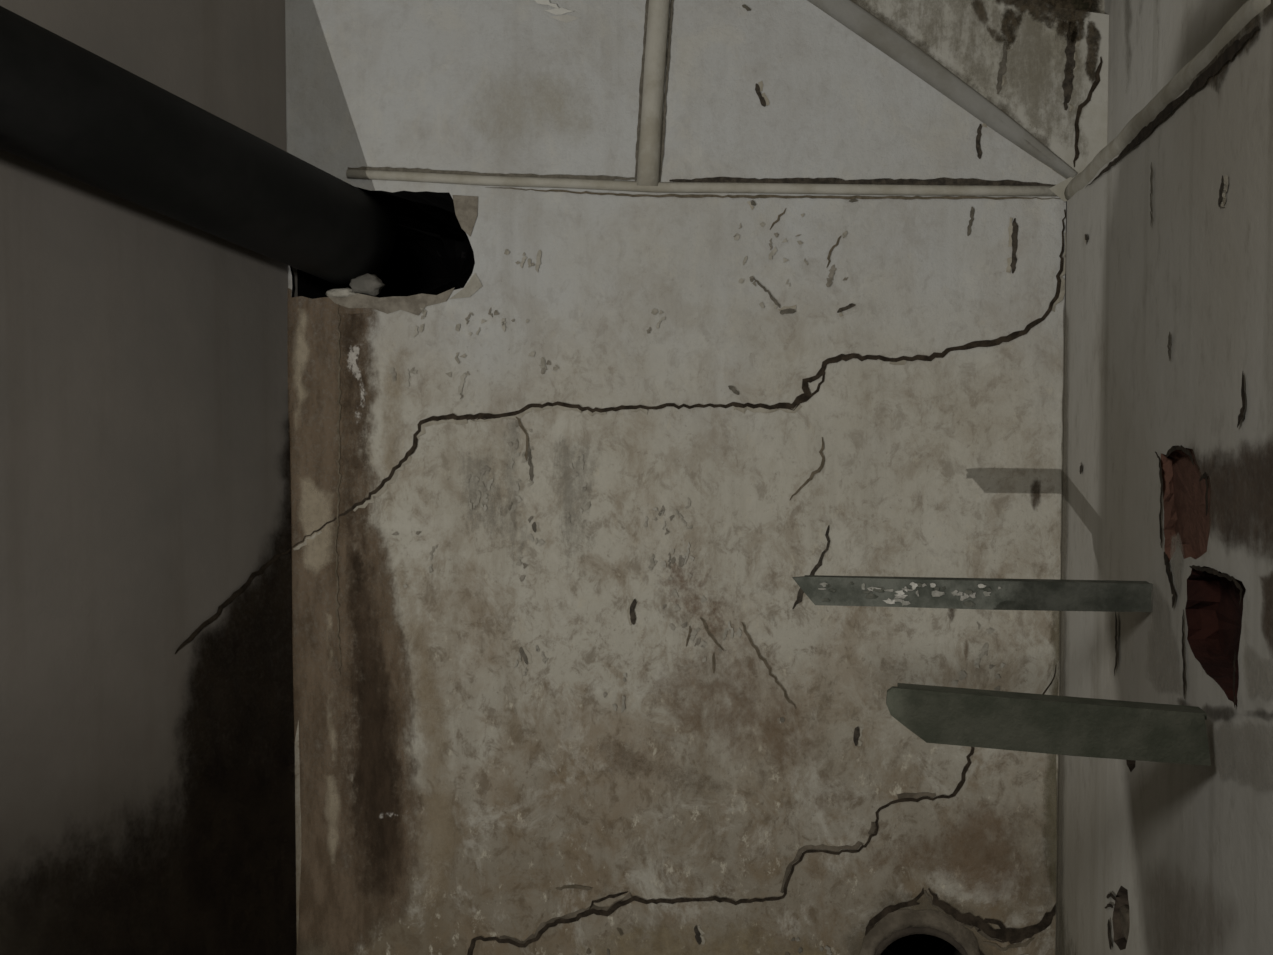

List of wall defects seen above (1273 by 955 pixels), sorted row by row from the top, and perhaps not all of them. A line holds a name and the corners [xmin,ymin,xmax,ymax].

damp [851,0,942,63]
damp [956,0,1101,145]
spalling [290,186,482,315]
damp [455,308,529,336]
crack [175,210,1066,654]
damp [643,498,742,662]
spalling [1155,445,1246,708]
crack [686,618,796,709]
crack [467,747,974,955]
crack [898,888,1056,951]
spalling [1105,886,1130,950]